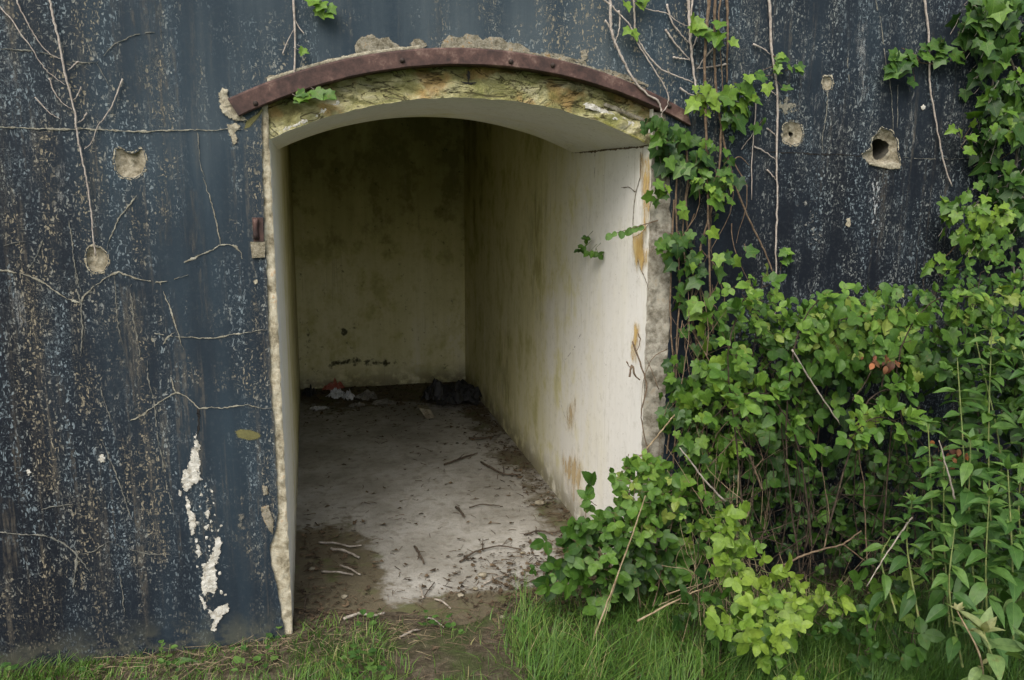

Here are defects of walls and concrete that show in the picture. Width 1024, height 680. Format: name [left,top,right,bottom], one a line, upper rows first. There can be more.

spalling [355,34,588,65]
spalling [821,75,835,92]
spalling [219,88,248,144]
spalling [778,97,804,147]
spalling [112,146,148,180]
spalling [862,126,901,224]
rust [633,156,650,270]
spalling [84,244,110,274]